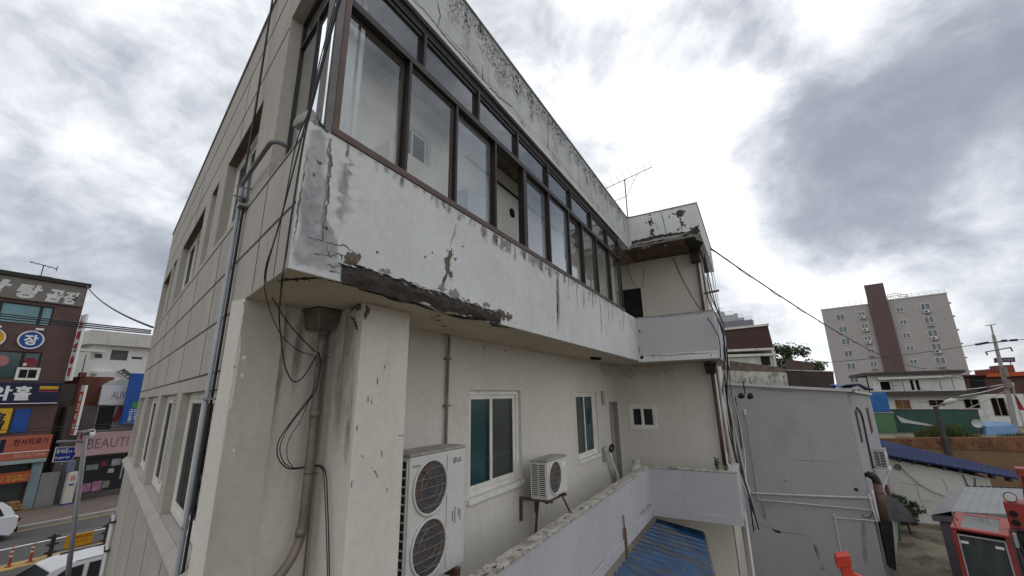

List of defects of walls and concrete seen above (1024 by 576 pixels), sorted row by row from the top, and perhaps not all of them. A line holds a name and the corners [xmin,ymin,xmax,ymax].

water stain [452,0,579,164]
spalling [630,209,703,260]
spalling [341,245,516,329]